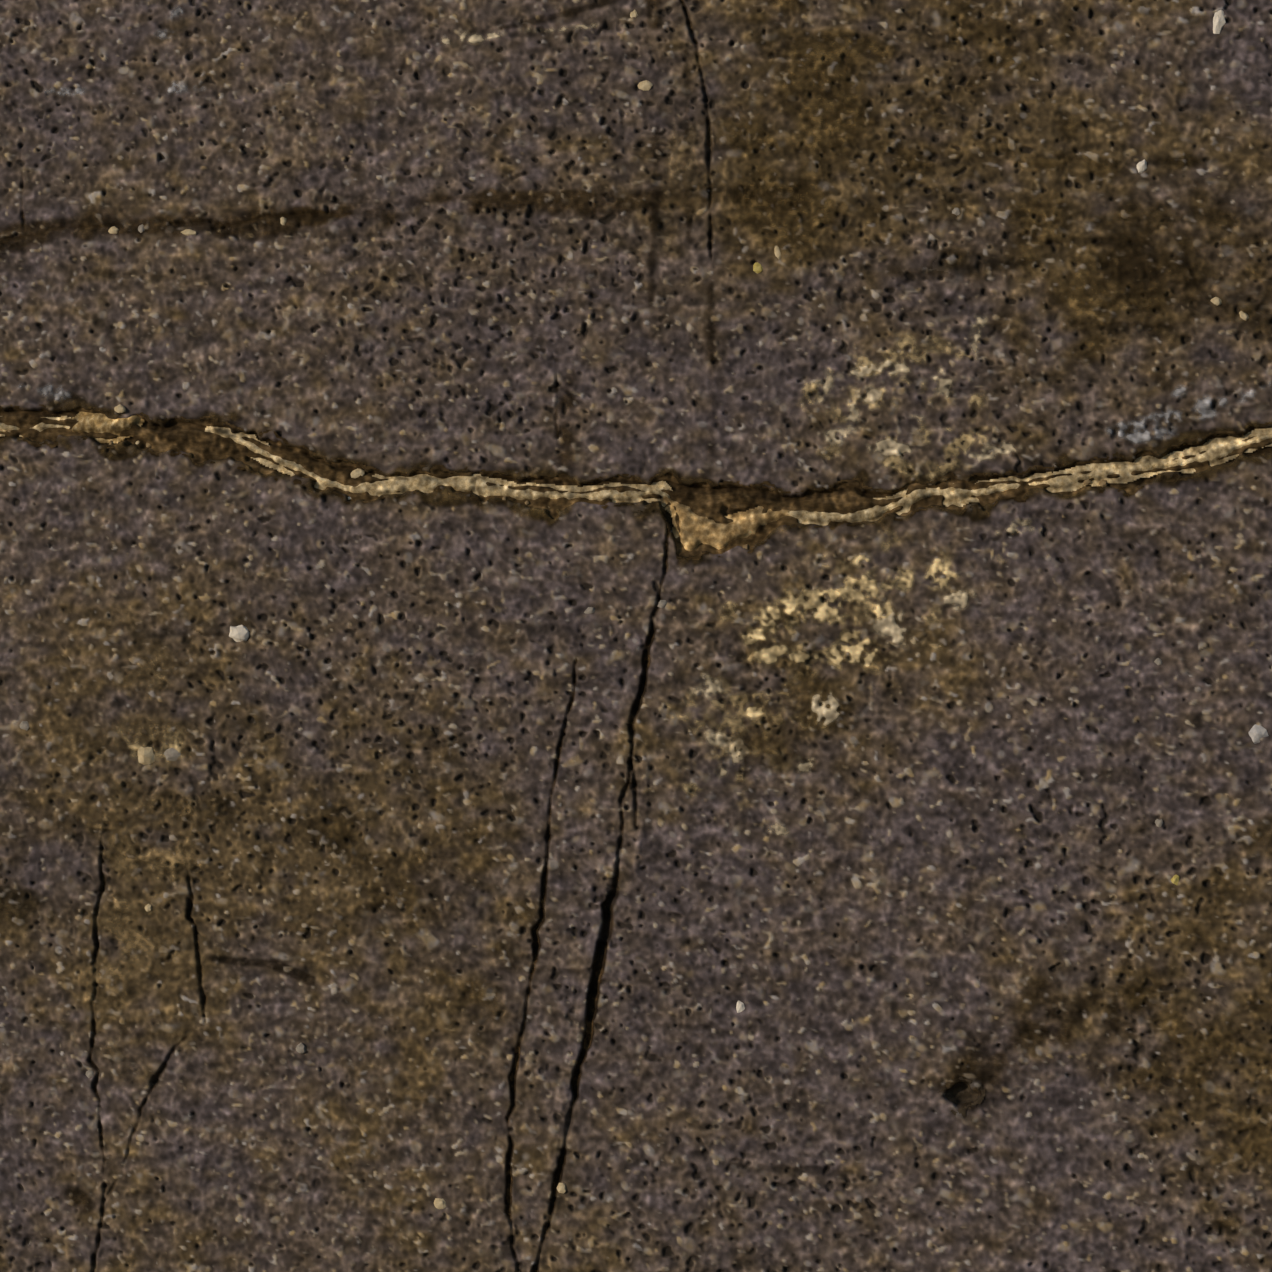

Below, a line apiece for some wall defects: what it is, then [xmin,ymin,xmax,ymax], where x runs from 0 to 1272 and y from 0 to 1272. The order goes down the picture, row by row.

crack [680,0,703,77]
crack [706,117,714,257]
crack [0,393,1272,1154]
water stain [690,556,968,780]
crack [505,659,577,1272]
crack [92,1188,113,1268]